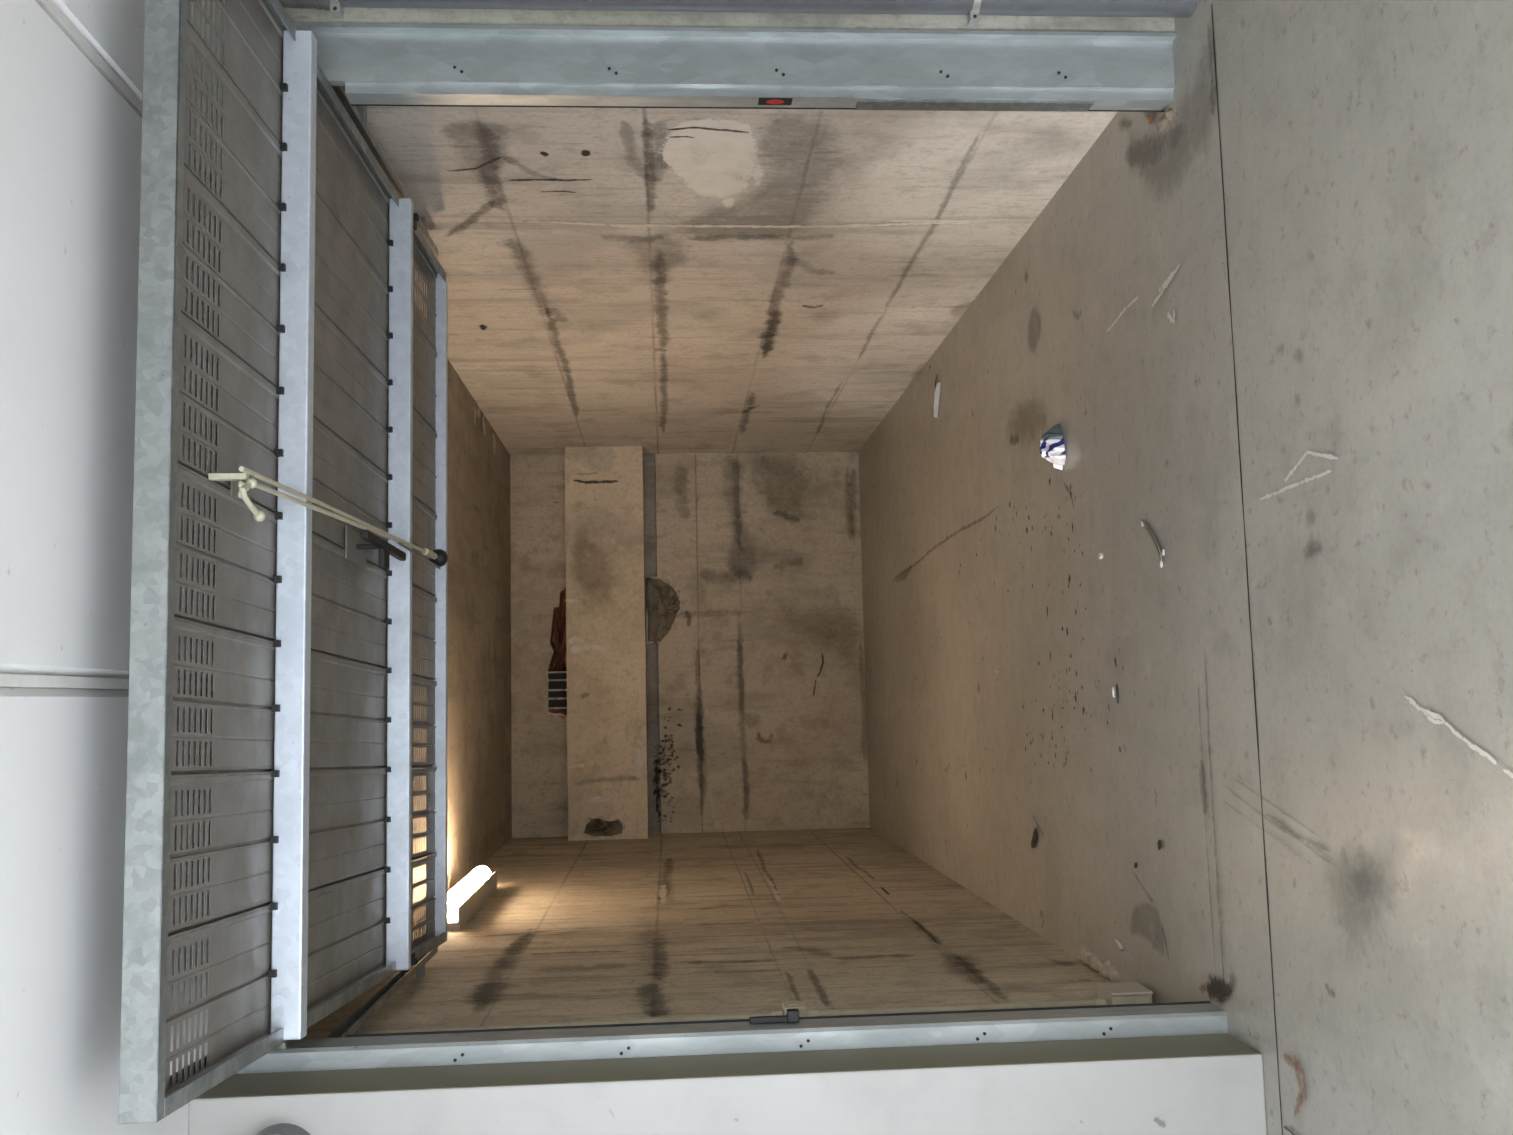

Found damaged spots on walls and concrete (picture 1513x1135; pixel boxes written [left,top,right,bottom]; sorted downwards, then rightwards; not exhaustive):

damp [653,707,704,822]